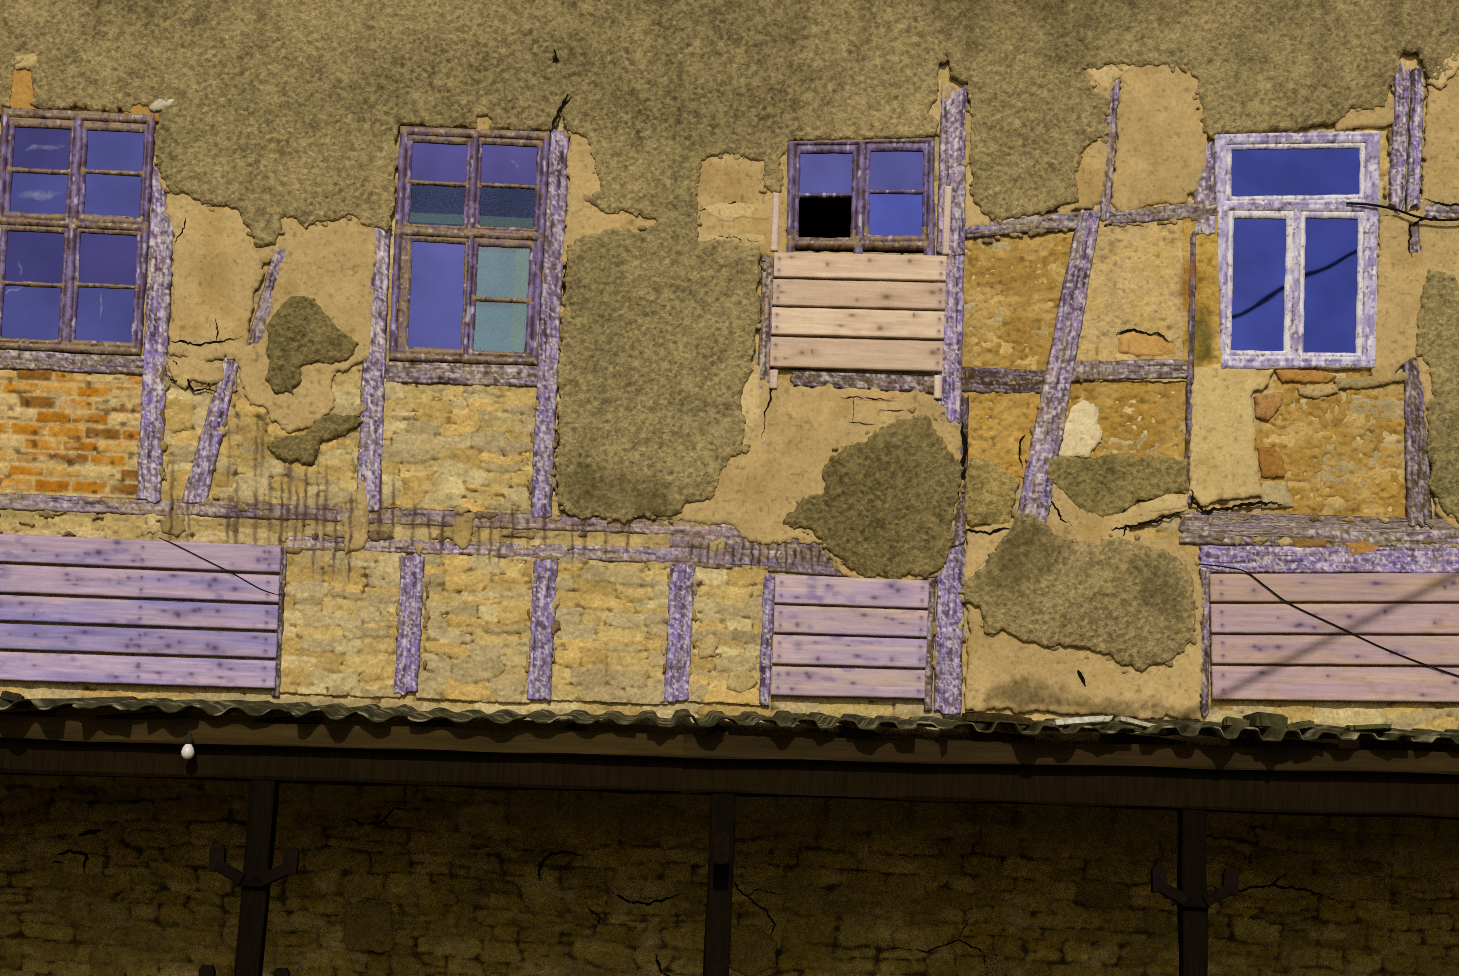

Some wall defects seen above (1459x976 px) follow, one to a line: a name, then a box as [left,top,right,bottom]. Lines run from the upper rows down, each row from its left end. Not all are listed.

spalling [560,131,657,266]
spalling [158,172,377,433]
spalling [657,53,1459,720]
spalling [1284,720,1315,731]
spalling [1344,723,1392,733]
crack [51,829,103,873]
crack [538,850,585,881]
crack [587,892,680,930]
crack [733,880,782,935]
crack [1207,874,1342,903]
crack [655,954,670,976]
crack [885,920,988,976]